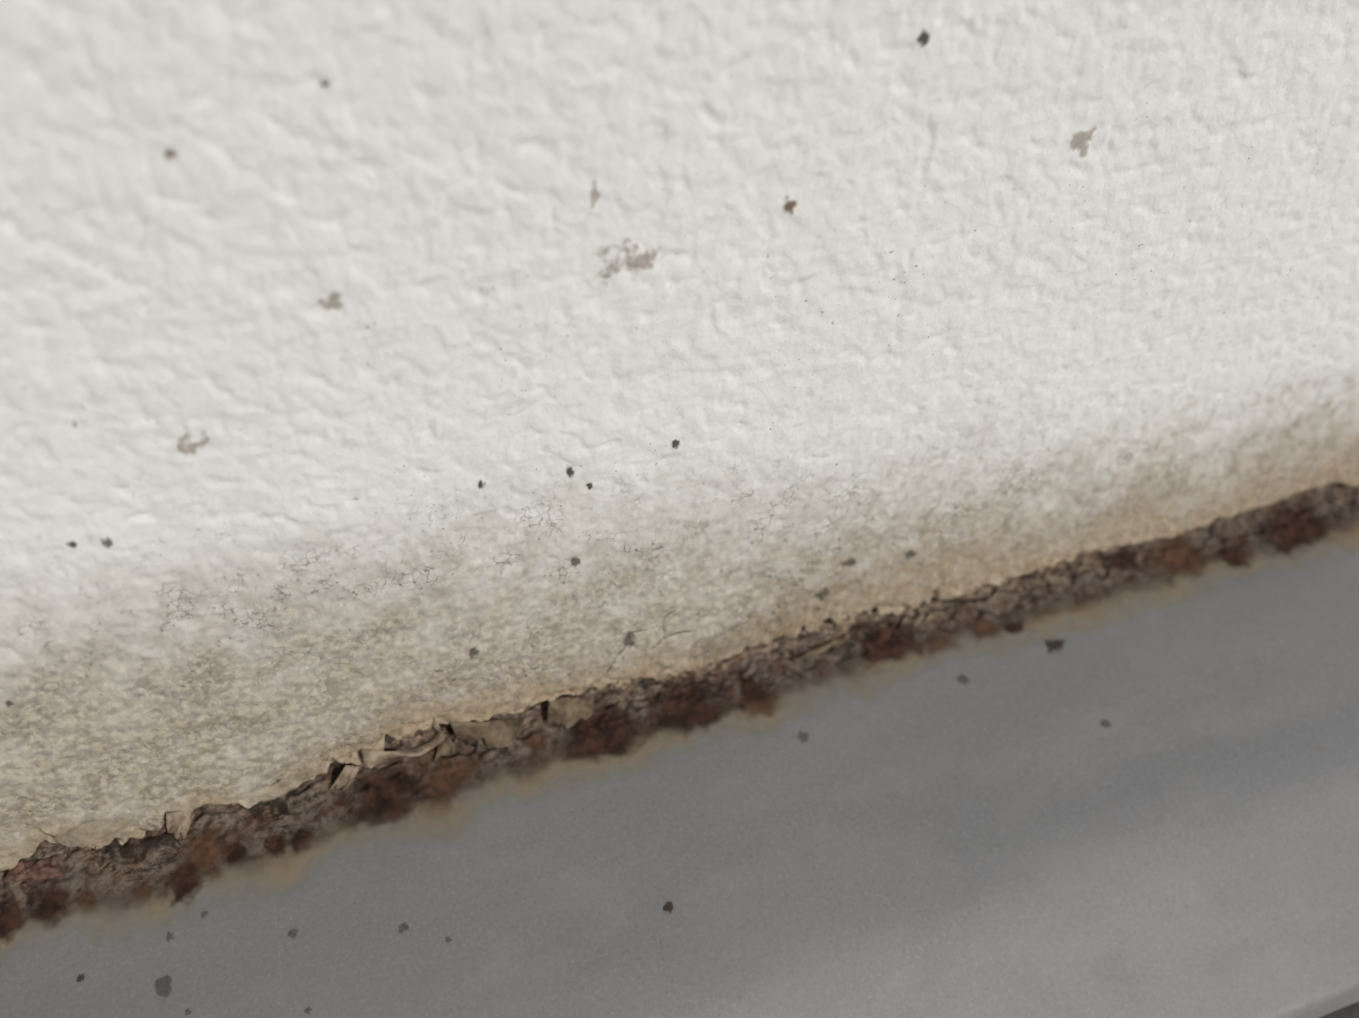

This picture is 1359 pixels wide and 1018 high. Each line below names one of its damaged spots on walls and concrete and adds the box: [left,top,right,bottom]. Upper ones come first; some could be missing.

rust [0,437,1359,948]
peeling [166,810,195,839]
peeling [2,855,65,892]